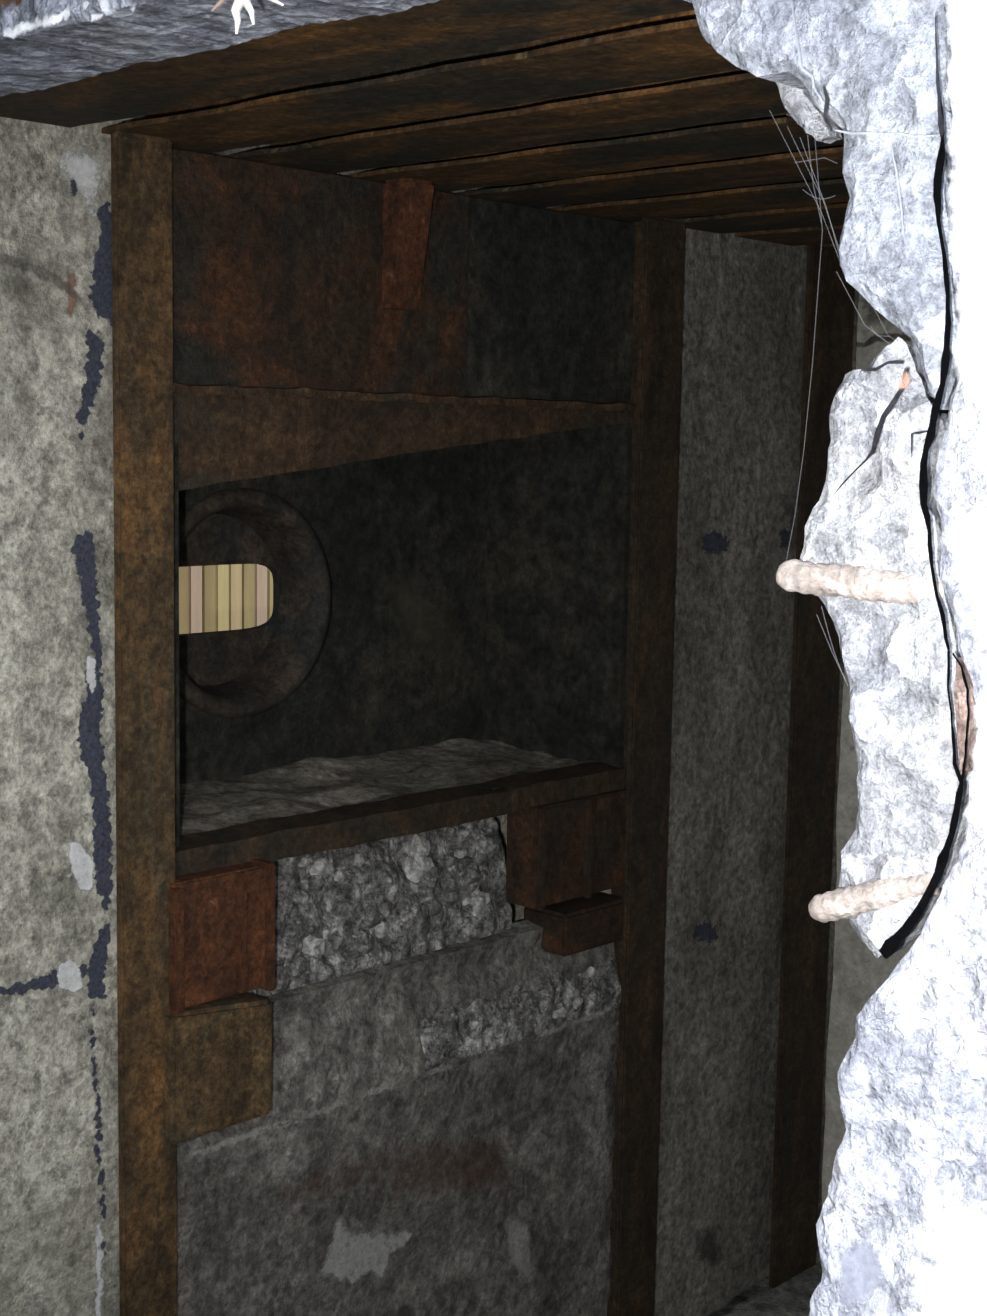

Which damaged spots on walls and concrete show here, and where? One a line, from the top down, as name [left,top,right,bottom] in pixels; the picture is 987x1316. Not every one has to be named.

spalling [776,82,842,144]
peeling [949,0,987,413]
crack [792,0,970,959]
spalling [776,559,943,605]
spalling [954,657,979,775]
crack [0,530,115,1256]
spalling [808,872,942,923]